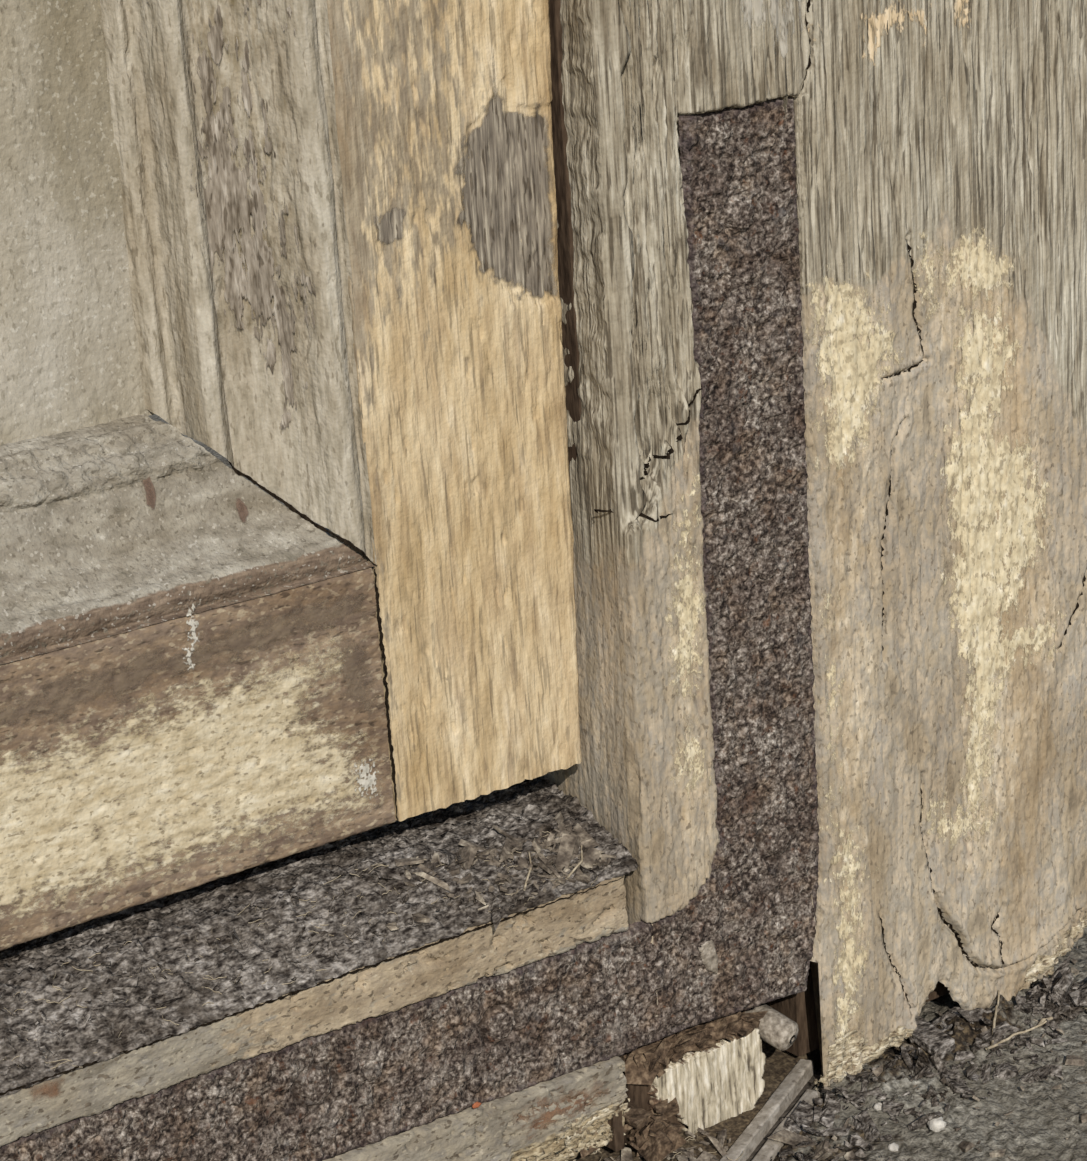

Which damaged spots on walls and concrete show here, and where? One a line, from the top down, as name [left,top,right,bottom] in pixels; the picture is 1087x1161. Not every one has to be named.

crack [801,0,812,90]
crack [882,243,924,380]
crack [640,386,702,480]
crack [594,509,673,522]
crack [881,431,898,651]
crack [1059,569,1087,648]
water stain [0,596,364,725]
crack [919,780,1018,969]
crack [879,916,911,1008]